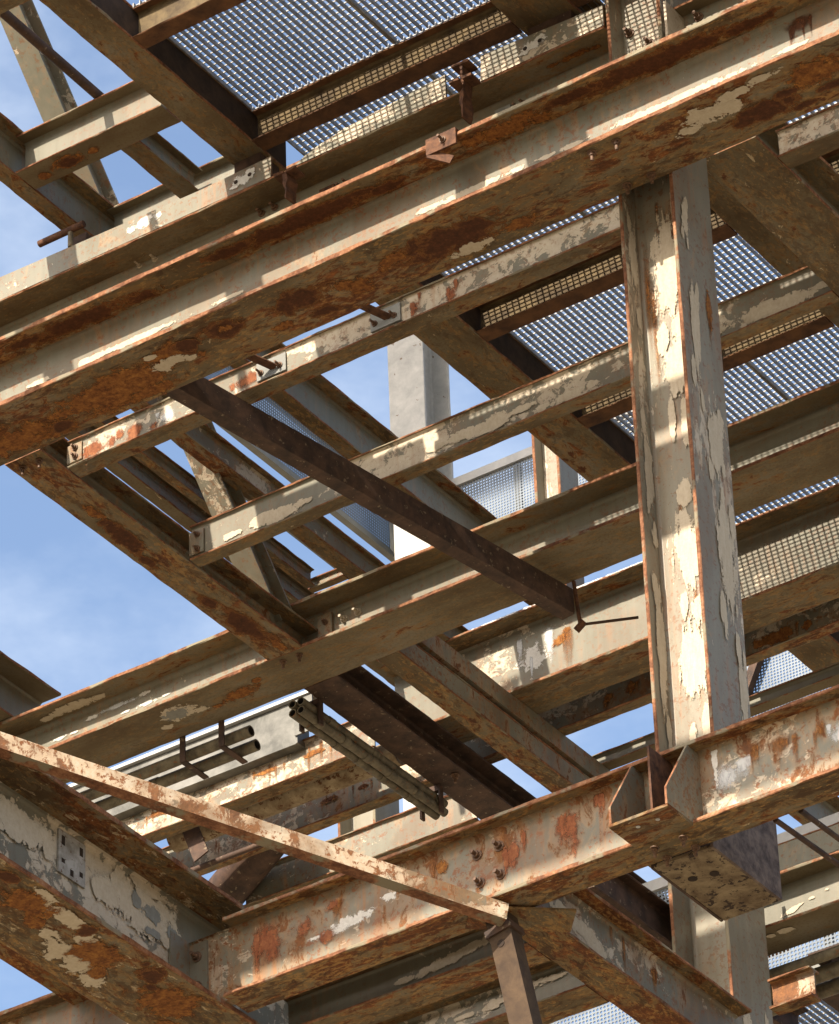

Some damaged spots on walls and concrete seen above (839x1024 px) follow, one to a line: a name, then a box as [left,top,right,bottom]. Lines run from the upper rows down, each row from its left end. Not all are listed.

corrosion [461,7,783,151]
peeling [610,39,809,139]
corrosion [199,172,411,263]
corrosion [377,207,537,269]
corrosion [0,316,246,464]
peeling [78,313,192,367]
corrosion [81,505,159,571]
peeling [224,497,315,541]
peeling [627,196,750,748]
peeling [0,794,56,861]
peeling [34,887,106,988]
corrosion [62,924,204,1024]